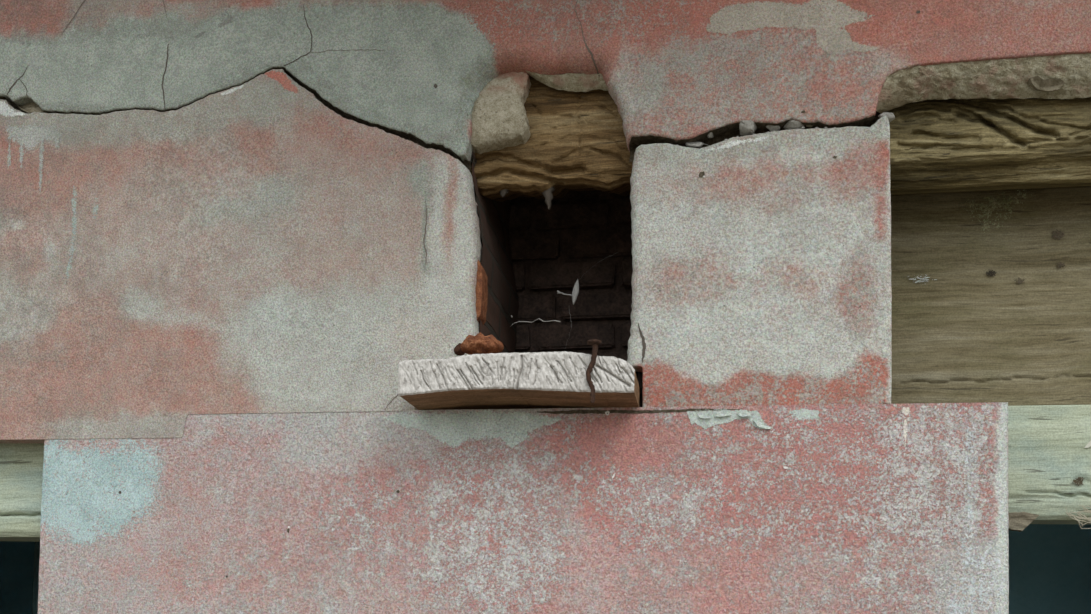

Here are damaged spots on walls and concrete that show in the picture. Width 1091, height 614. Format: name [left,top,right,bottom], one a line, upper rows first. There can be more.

flaking render [706,0,878,56]
crack [7,66,28,113]
flaking render [16,102,47,113]
crack [161,44,169,108]
peeling [265,71,299,93]
crack [284,6,471,168]
flaking render [471,71,608,154]
peeling [687,408,772,430]
peeling [380,409,564,600]